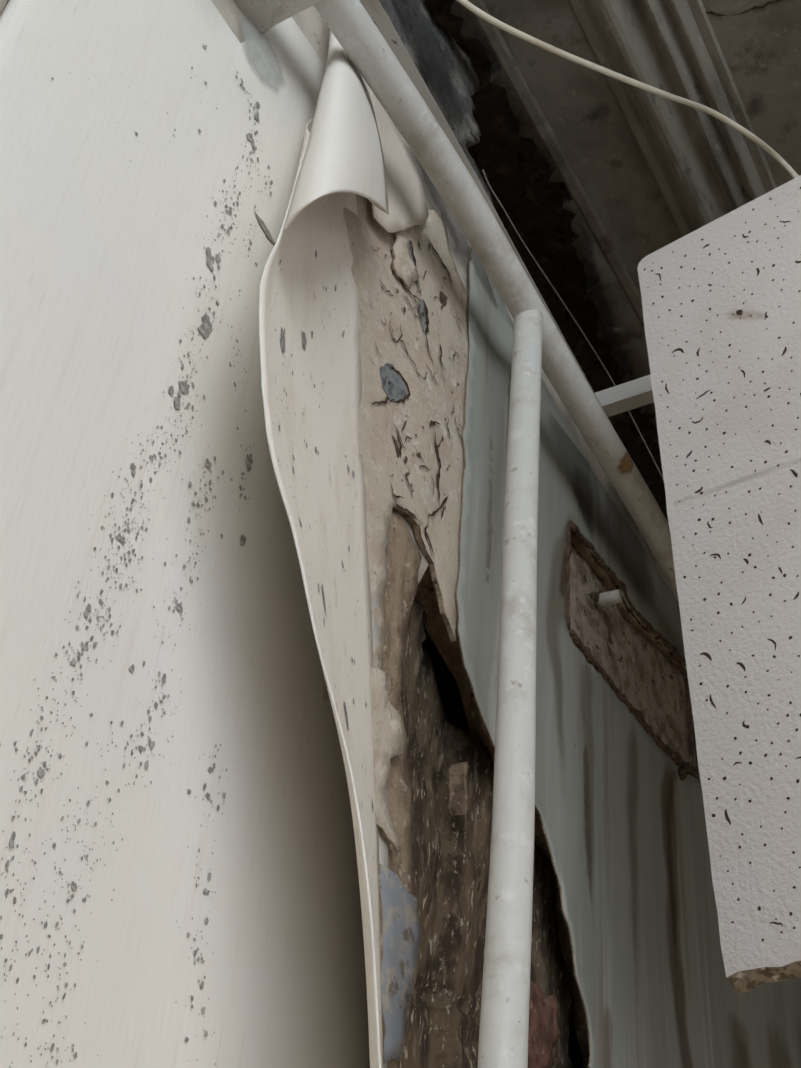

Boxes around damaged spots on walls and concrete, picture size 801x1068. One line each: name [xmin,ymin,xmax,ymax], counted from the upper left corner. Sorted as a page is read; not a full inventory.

crack [706,0,781,17]
crack [371,236,463,555]
water stain [0,71,273,1067]
peeling [343,194,471,1068]
spalling [565,520,699,781]